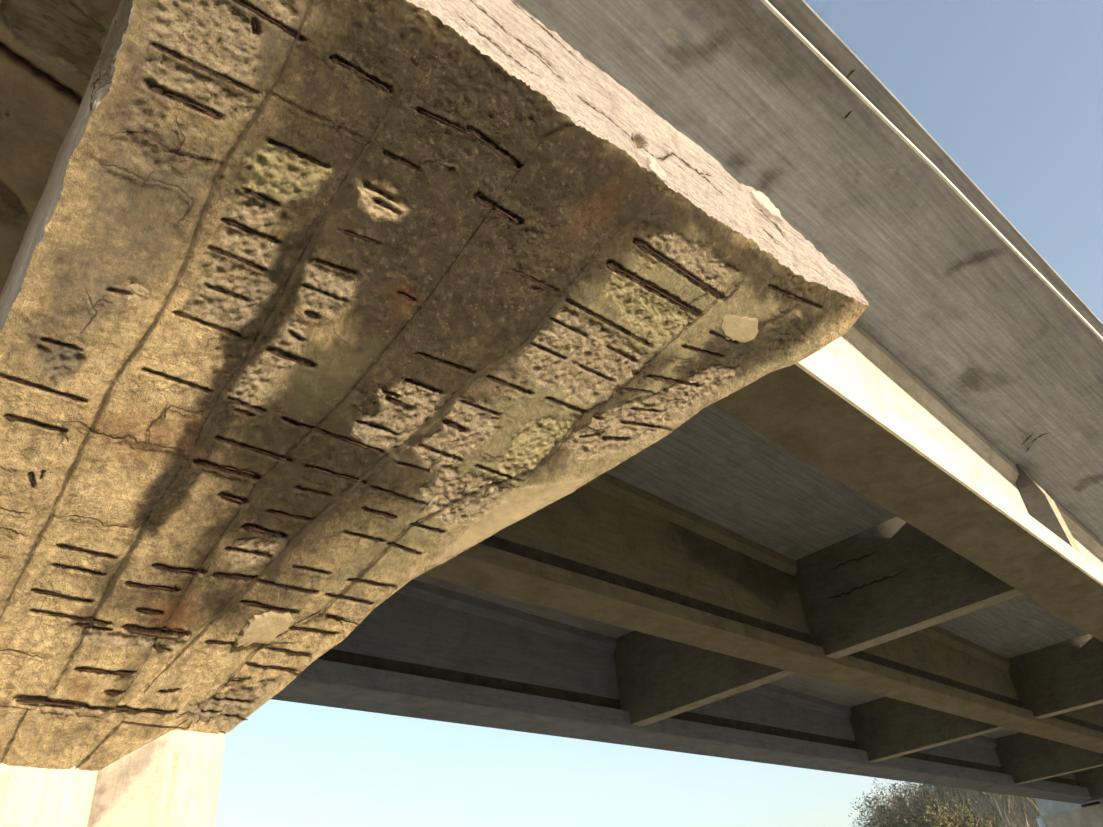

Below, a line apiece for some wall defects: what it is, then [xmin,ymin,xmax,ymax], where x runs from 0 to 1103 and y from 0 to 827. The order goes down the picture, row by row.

crack [89,40,122,114]
water stain [37,105,192,339]
crack [100,116,214,228]
spalling [358,179,408,219]
spalling [631,137,667,180]
water stain [124,0,846,622]
crack [61,405,198,456]
crack [0,466,30,536]
crack [58,515,132,529]
crack [0,649,47,659]
peeling [206,600,338,657]
spalling [16,664,302,727]